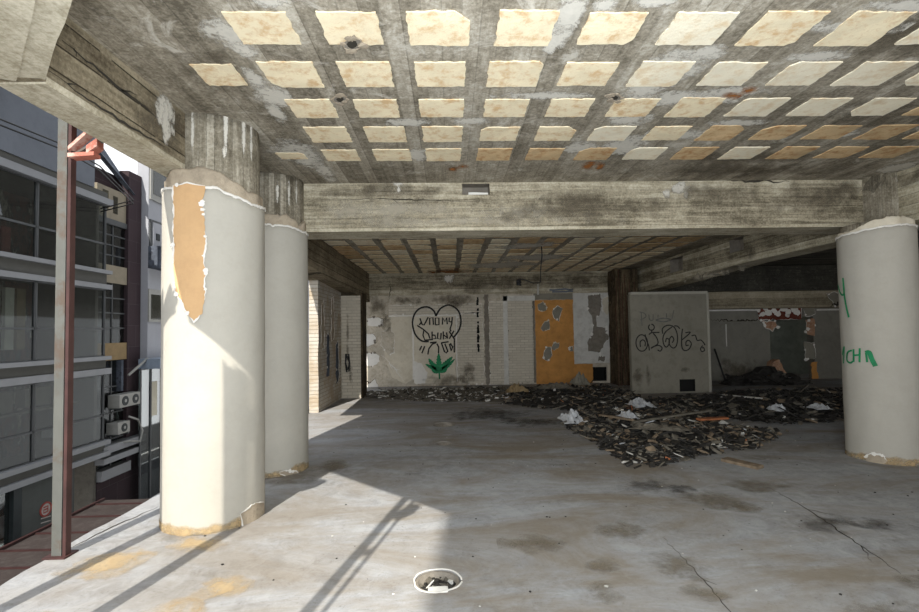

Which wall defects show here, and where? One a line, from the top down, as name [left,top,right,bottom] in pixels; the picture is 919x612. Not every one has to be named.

leakage [654,181,719,205]
peeling [161,182,266,323]
peeling [532,302,563,332]
peeling [586,293,609,363]
peeling [757,308,819,379]
crack [772,489,901,574]
crack [664,538,731,612]